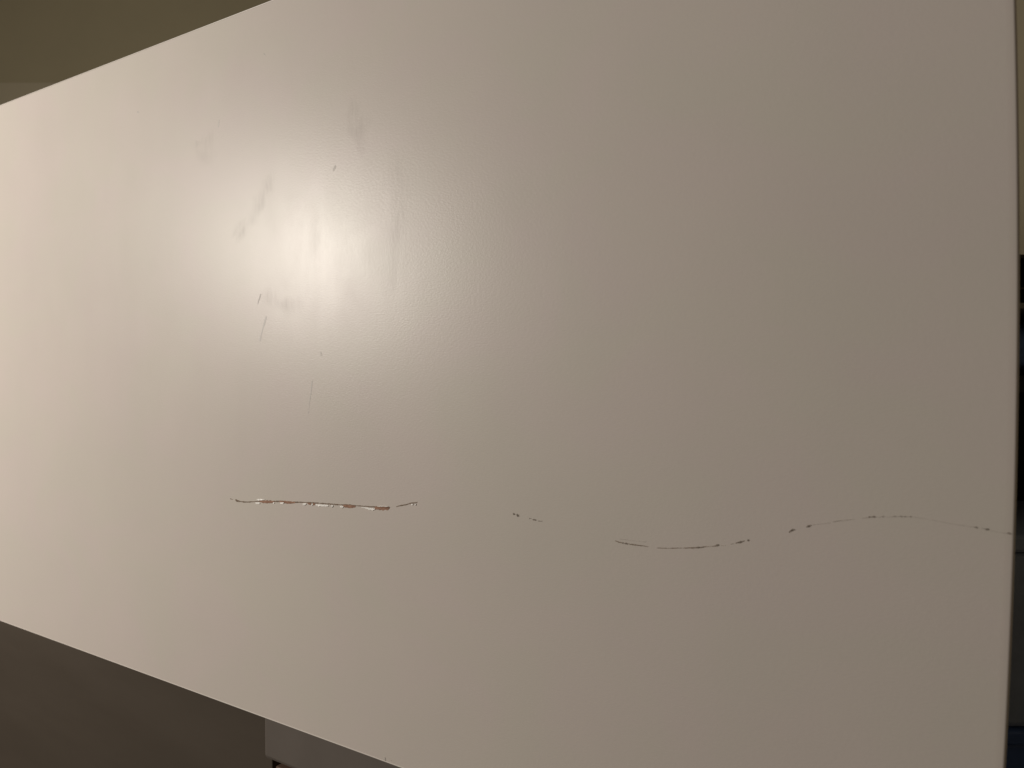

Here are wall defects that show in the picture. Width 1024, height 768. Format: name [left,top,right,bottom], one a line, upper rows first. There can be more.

crack [230,498,417,510]
crack [616,539,749,549]